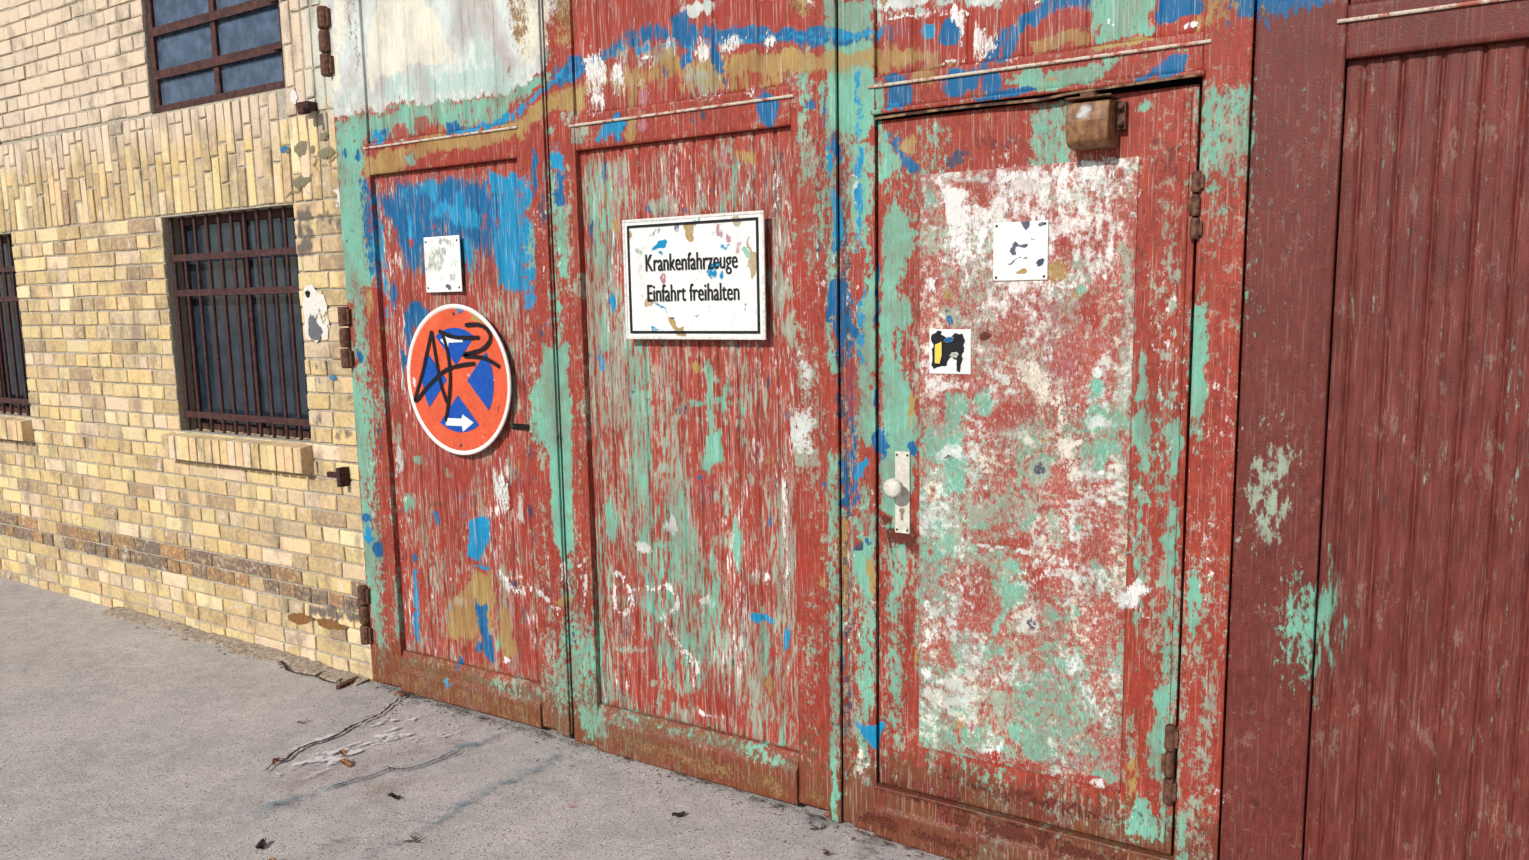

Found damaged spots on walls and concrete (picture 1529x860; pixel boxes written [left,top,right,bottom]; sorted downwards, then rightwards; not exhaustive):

peeling [695,32,747,63]
peeling [889,9,998,65]
peeling [582,48,654,113]
peeling [937,158,1118,290]
peeling [1014,353,1129,498]
peeling [975,446,1003,475]
peeling [494,476,510,514]
peeling [611,573,696,687]
peeling [1013,603,1041,636]
peeling [1123,584,1150,619]
crack [263,690,407,771]
peeling [356,687,890,853]